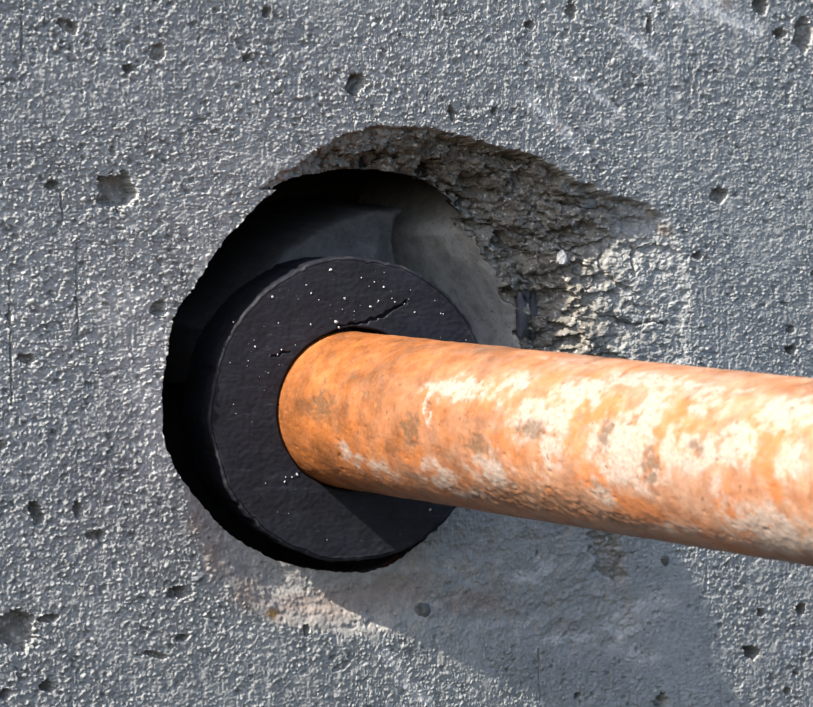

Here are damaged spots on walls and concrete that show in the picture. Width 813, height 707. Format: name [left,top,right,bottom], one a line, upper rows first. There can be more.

spalling [258,105,704,366]